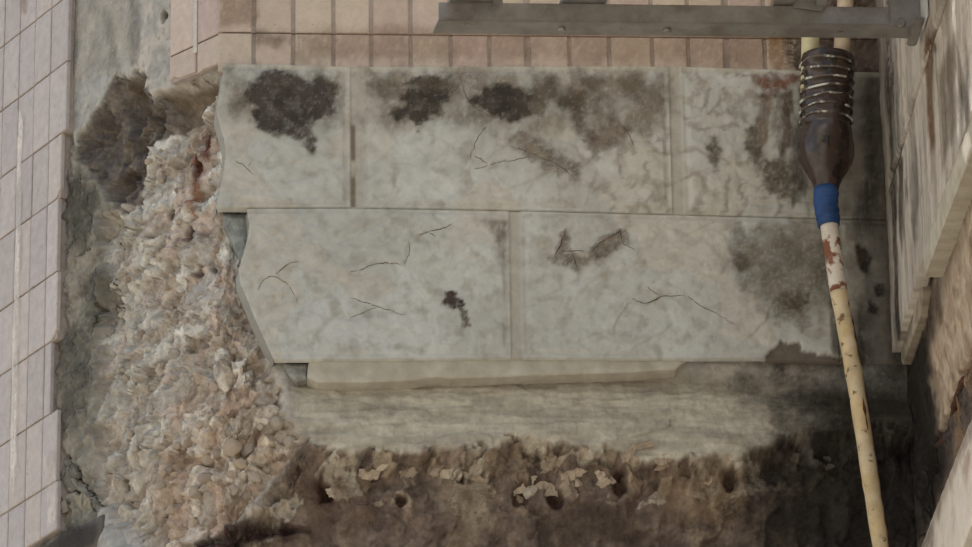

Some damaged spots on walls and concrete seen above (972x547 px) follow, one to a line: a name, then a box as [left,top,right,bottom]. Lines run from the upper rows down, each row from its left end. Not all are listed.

mould [233,70,336,153]
mould [378,76,453,125]
crack [462,85,571,175]
leakage [519,138,578,176]
leakage [470,77,628,151]
crack [350,224,451,272]
crack [555,229,633,266]
leakage [443,291,468,327]
spalling [60,71,872,547]
crack [633,290,734,324]
spalling [851,313,917,547]
corrosion [934,367,971,450]